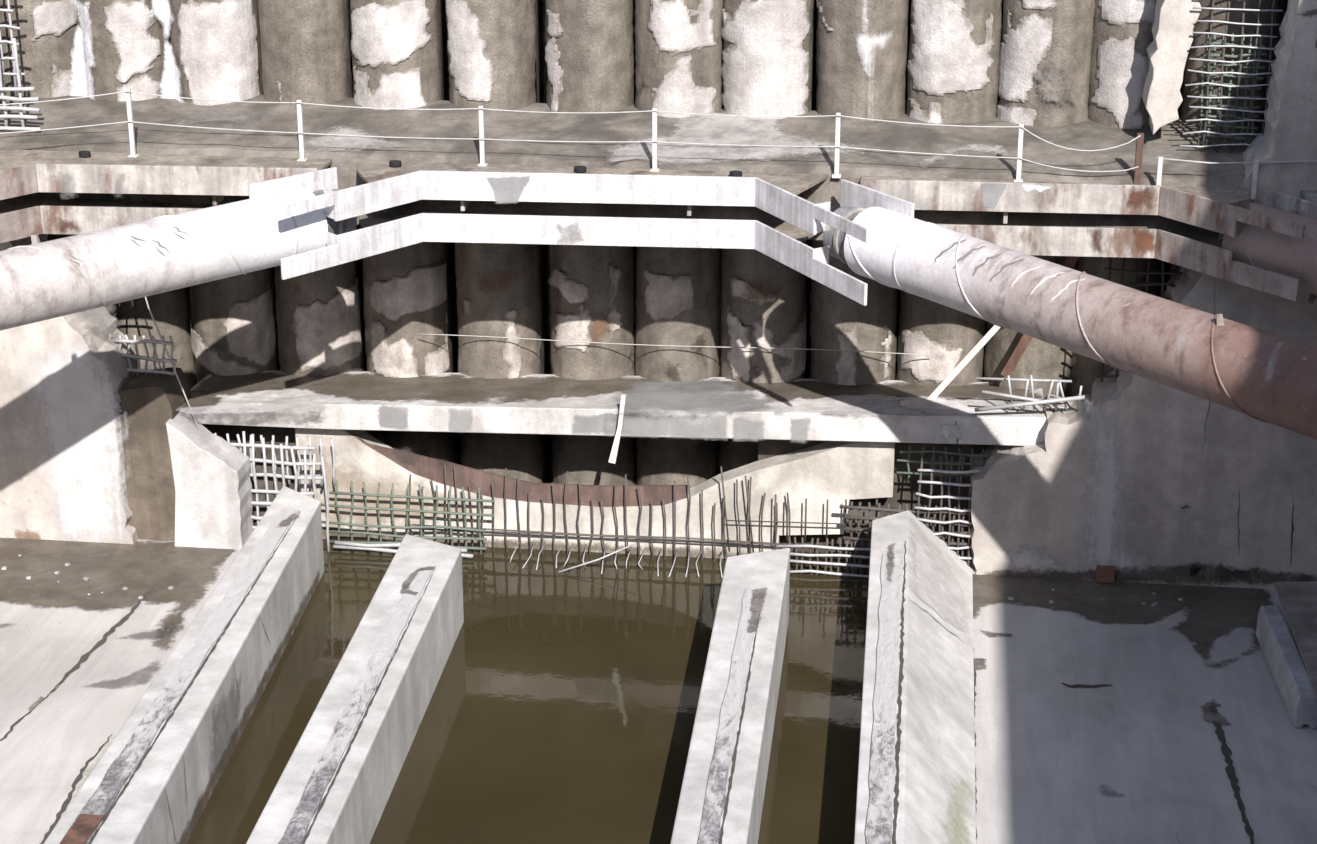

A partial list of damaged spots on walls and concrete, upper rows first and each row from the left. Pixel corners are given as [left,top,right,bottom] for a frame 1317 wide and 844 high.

peeling [0,0,77,131]
peeling [351,0,495,110]
peeling [545,9,564,112]
peeling [648,0,833,119]
spalling [1180,0,1283,153]
peeling [548,263,623,354]
peeling [726,274,806,383]
peeling [880,323,964,384]
spalling [214,431,999,582]
crack [0,588,153,741]
crack [40,734,112,844]
crack [1200,702,1254,844]